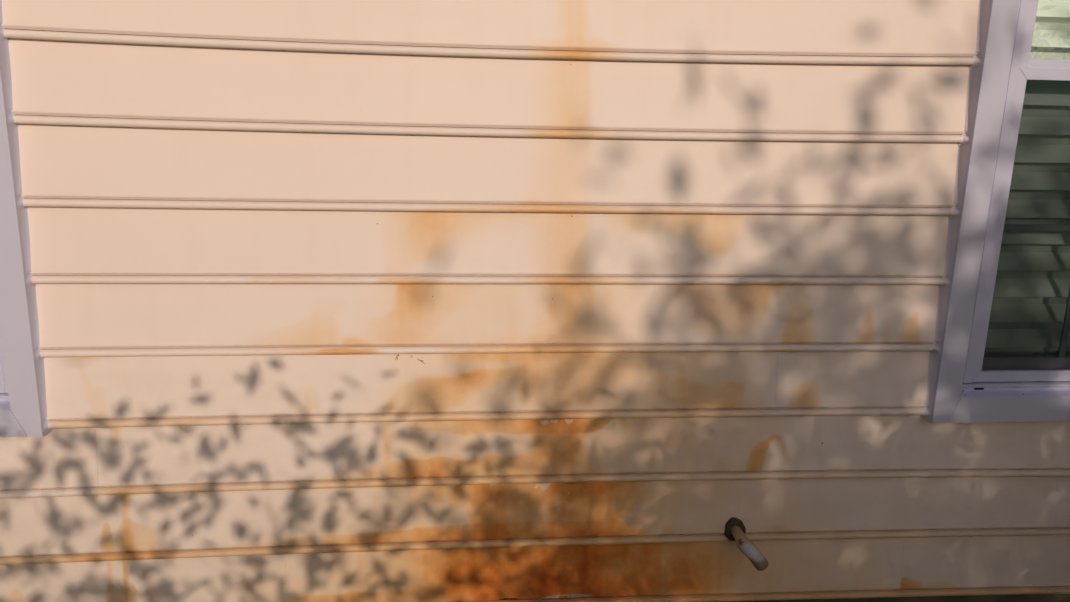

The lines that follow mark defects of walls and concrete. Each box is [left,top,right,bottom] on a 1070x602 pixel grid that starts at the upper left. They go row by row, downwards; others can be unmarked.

corrosion [350,0,779,277]
corrosion [0,276,1070,602]